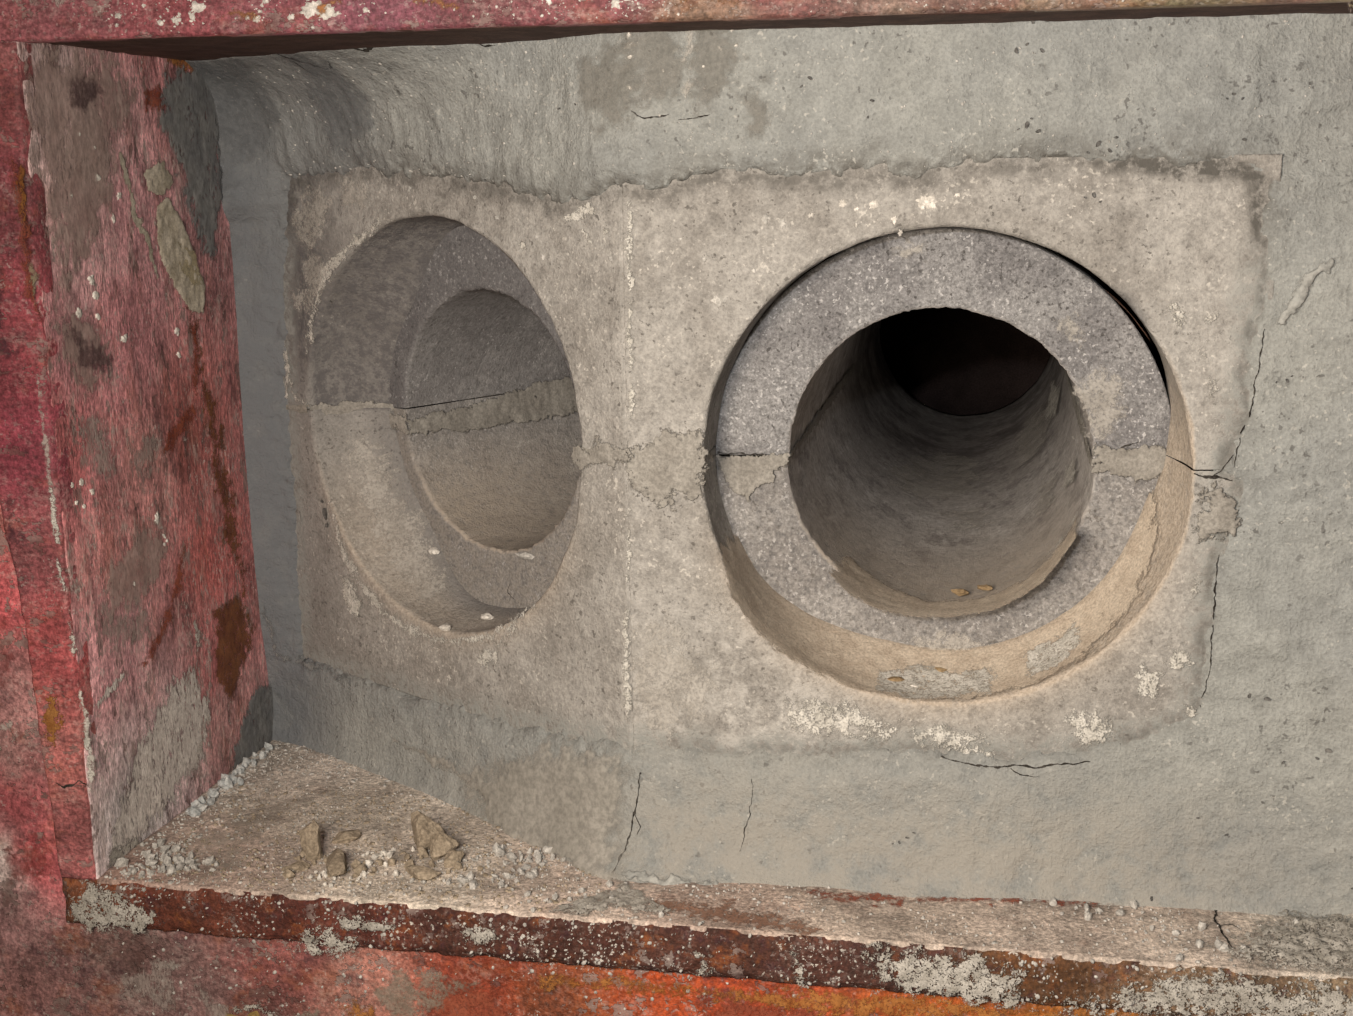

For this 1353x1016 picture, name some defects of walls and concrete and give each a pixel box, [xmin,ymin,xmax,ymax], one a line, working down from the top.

crack [1194,329,1265,481]
crack [941,755,1090,777]
crack [612,772,641,873]
rust [402,976,516,1016]
rust [538,974,1108,1016]